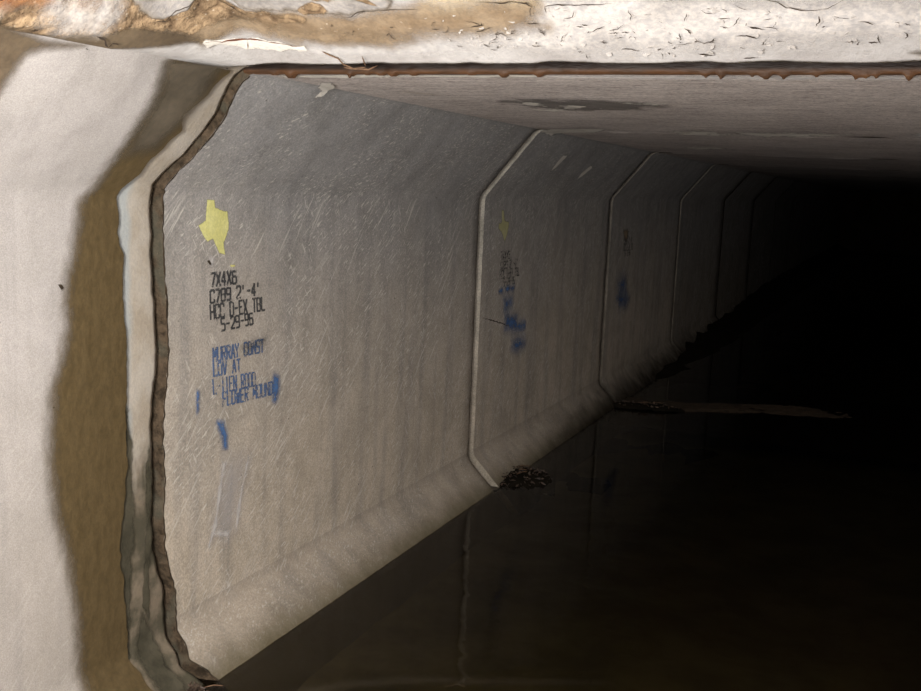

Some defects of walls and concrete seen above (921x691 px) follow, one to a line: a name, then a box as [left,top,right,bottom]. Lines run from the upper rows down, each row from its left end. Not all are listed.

spalling [0,0,547,53]
leakage [0,0,921,90]
peeling [550,7,715,58]
peeling [711,7,796,59]
peeling [815,15,881,45]
rust [243,61,921,81]
leakage [500,99,668,112]